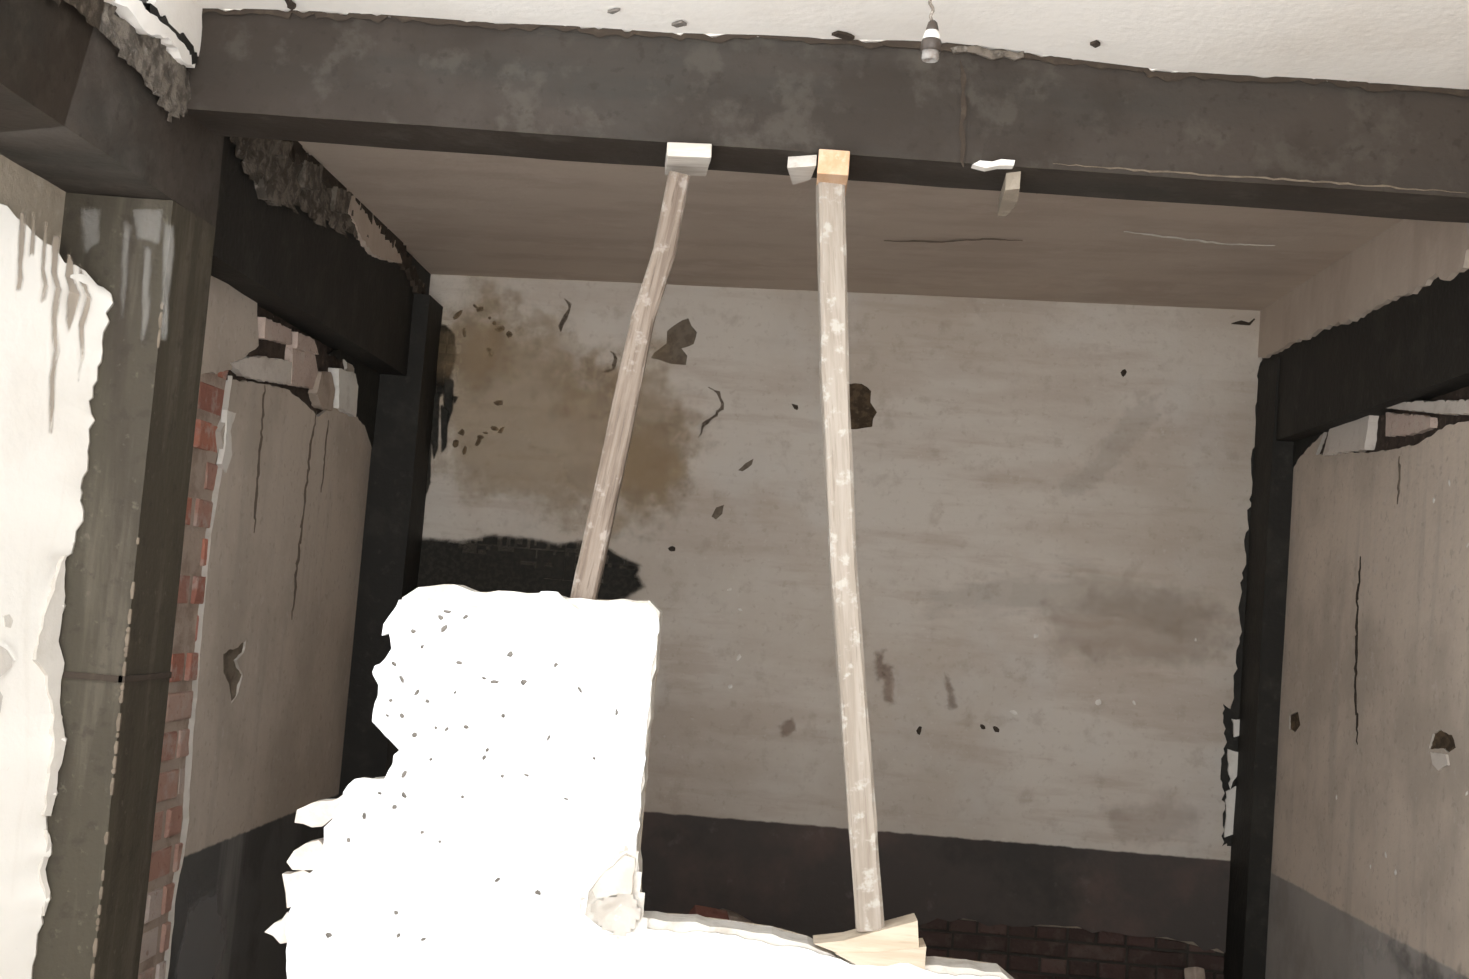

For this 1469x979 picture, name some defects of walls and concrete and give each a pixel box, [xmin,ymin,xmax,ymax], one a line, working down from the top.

spalling [53,0,202,123]
spalling [230,137,402,263]
damp [17,213,91,433]
damp [453,304,513,357]
peeling [1258,219,1469,358]
crack [254,385,266,533]
crack [291,411,329,620]
damp [426,378,504,494]
spalling [849,383,877,429]
spalling [1356,386,1469,453]
flaking render [138,306,344,979]
crack [1353,556,1361,745]